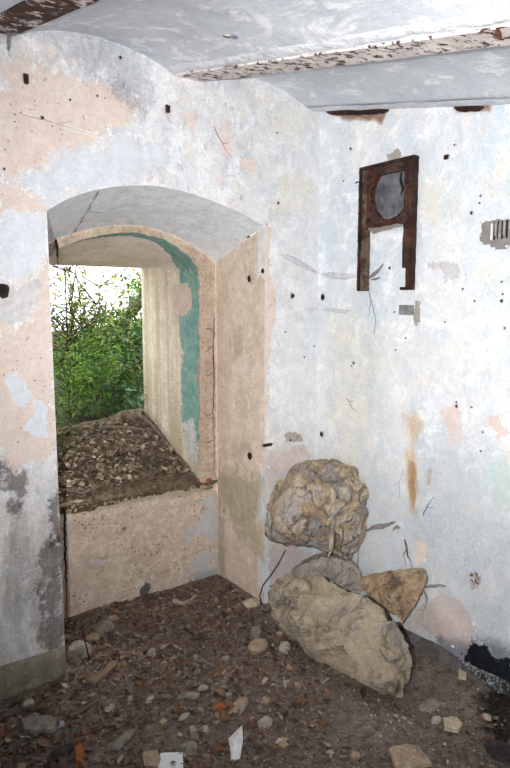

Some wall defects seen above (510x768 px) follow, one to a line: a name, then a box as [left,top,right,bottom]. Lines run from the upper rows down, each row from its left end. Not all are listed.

corrosion [326,109,389,121]
crack [55,191,101,266]
peeling [0,53,179,474]
spalling [479,219,510,252]
corrosion [407,451,417,507]
crack [61,508,69,618]
water stain [438,638,510,742]